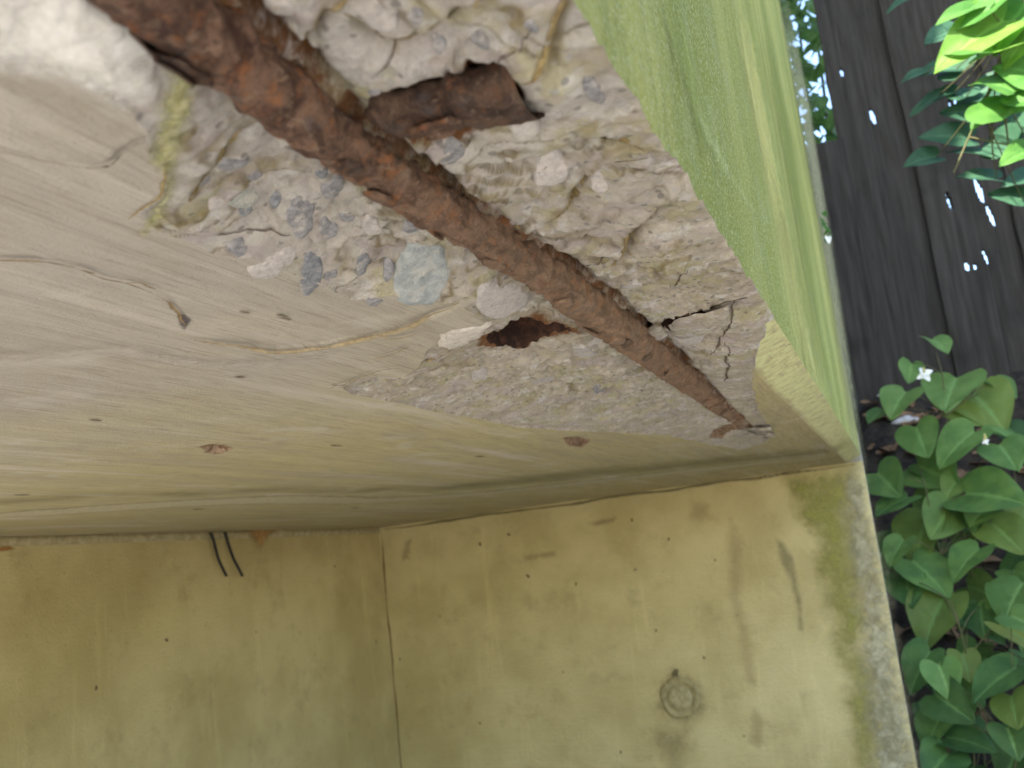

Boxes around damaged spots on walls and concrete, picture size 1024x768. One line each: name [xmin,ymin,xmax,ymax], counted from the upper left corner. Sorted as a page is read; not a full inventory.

spalling [0,0,775,450]
crack [0,260,459,388]
crack [706,301,735,382]